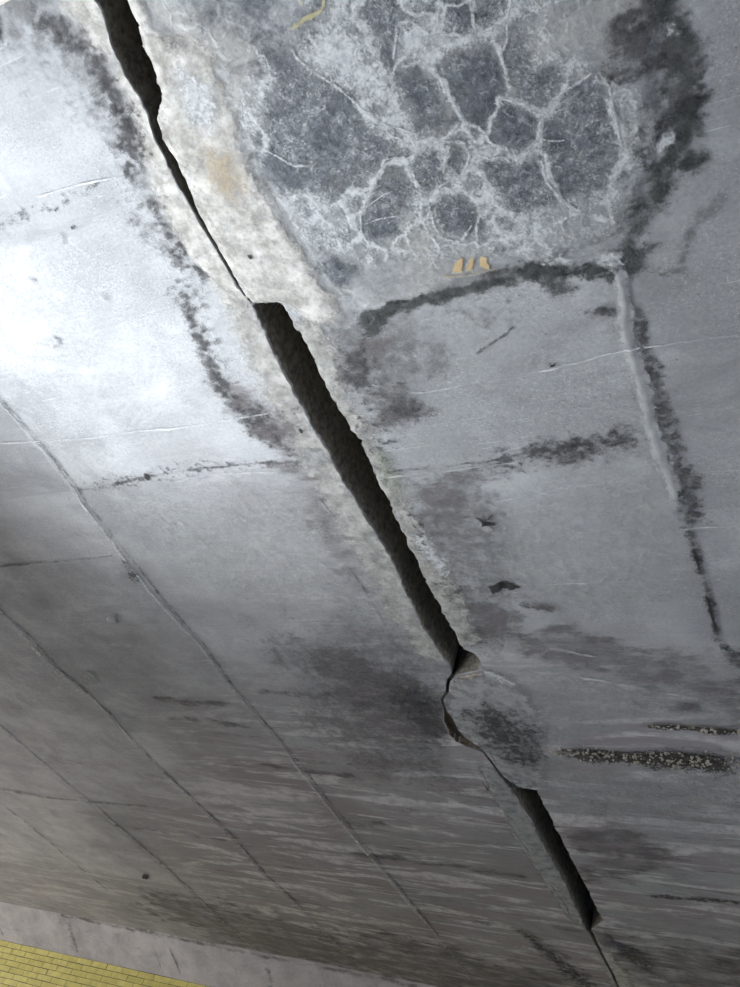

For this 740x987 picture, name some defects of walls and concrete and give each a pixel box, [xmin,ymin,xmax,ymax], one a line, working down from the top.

damp [32,15,153,192]
crack [158,139,252,302]
crack [441,650,473,710]
crack [471,742,502,777]
spalling [553,746,740,777]
spalling [644,724,740,736]